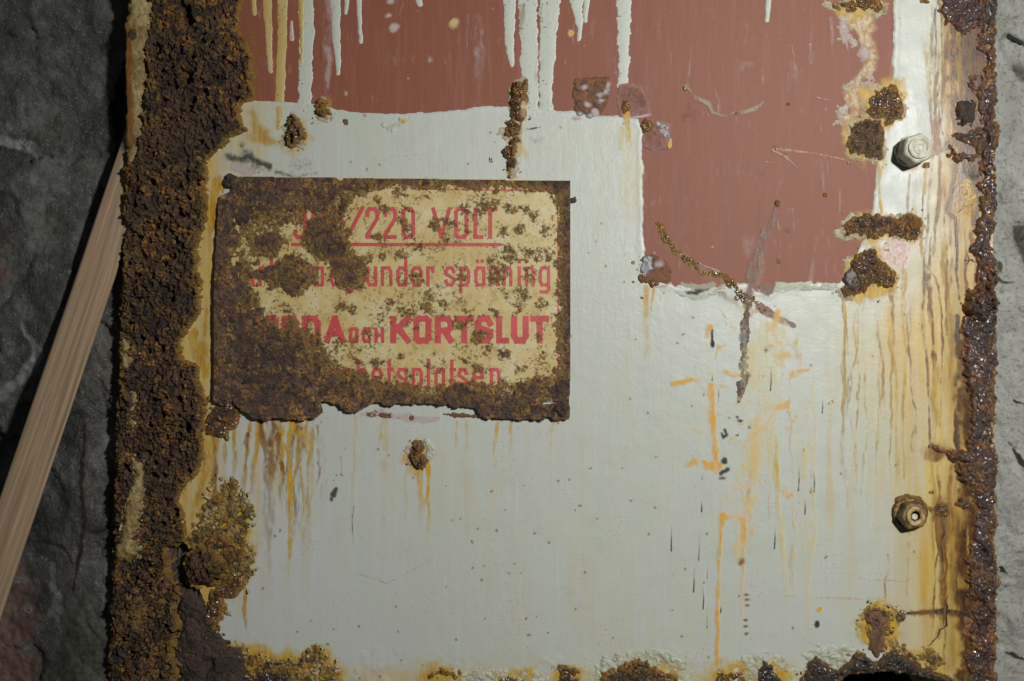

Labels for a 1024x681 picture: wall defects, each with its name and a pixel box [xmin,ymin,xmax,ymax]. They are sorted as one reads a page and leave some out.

peeling [833,12,878,126]
peeling [675,276,734,300]
peeling [746,281,838,305]
rust [107,0,577,681]
rust [706,325,726,357]
rust [711,0,1002,681]
rust [670,370,762,479]
rust [551,659,583,681]
rust [600,657,686,681]